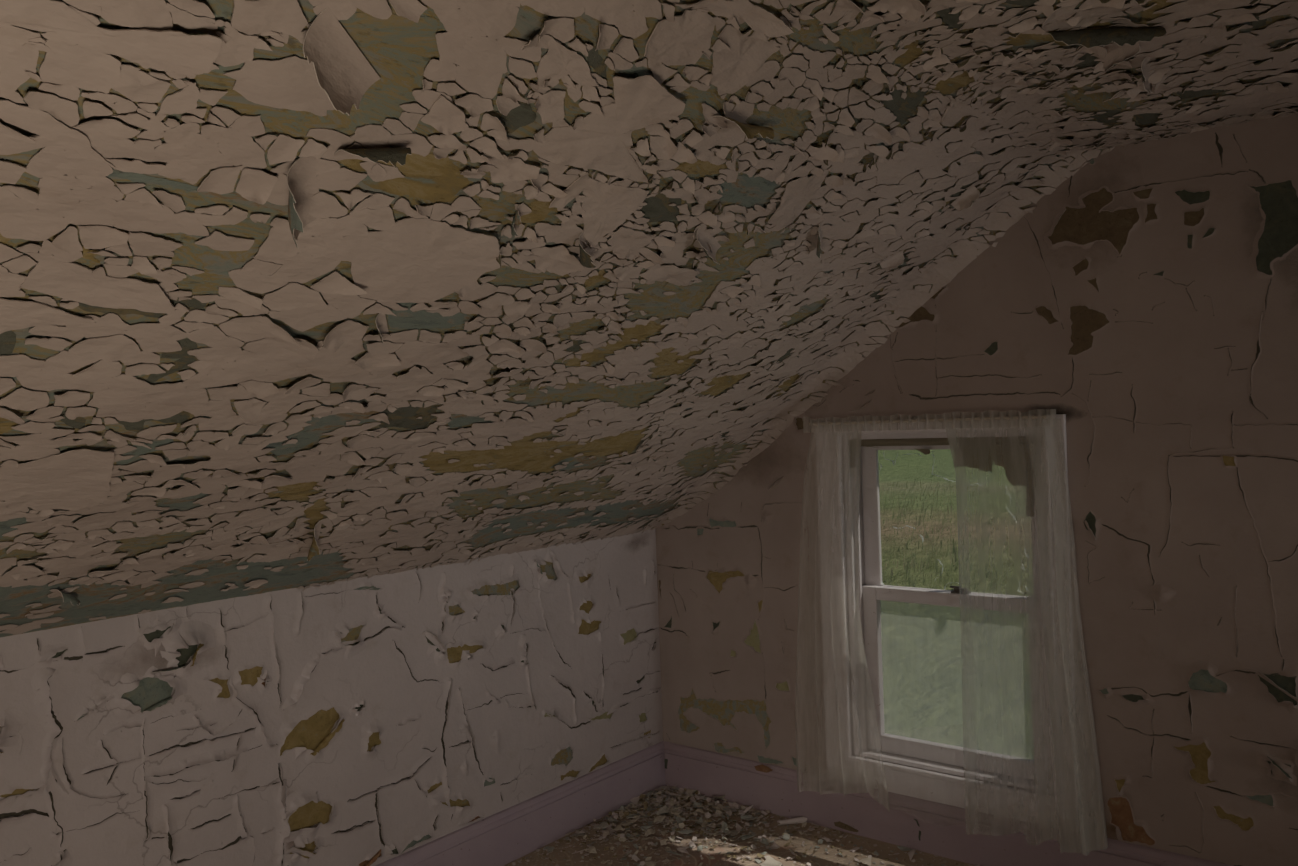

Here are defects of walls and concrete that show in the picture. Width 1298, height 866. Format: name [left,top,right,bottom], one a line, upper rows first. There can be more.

crack [1112,131,1266,194]
crack [658,503,798,620]
crack [1099,278,1298,779]
peeling [109,609,273,719]
peeling [276,696,385,767]
crack [0,570,690,866]
peeling [440,622,508,671]
peeling [1254,668,1298,713]
peeling [275,787,339,866]
peeling [1103,794,1159,848]